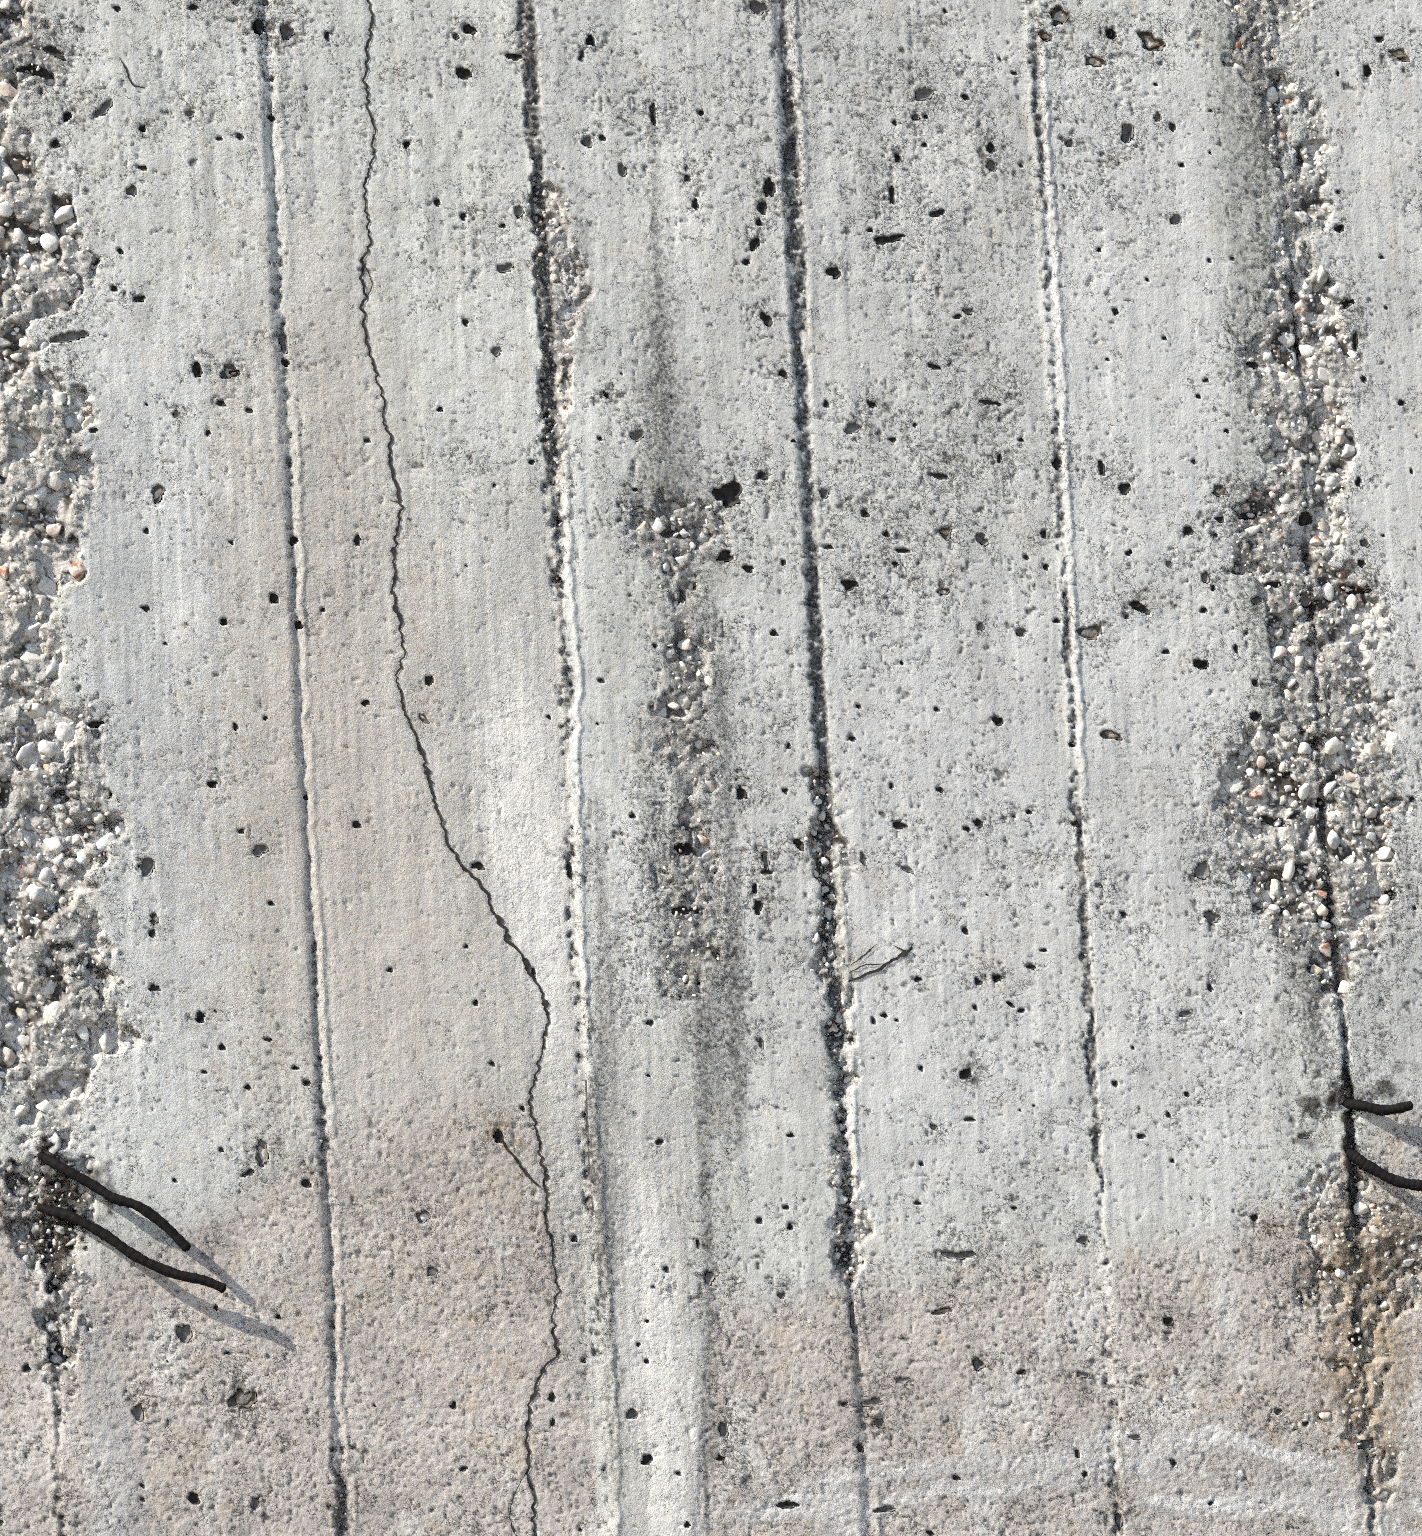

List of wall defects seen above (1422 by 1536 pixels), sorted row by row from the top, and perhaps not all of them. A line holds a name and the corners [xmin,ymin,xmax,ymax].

spalling [0,0,142,1409]
crack [359,0,561,1536]
spalling [1211,0,1409,1007]